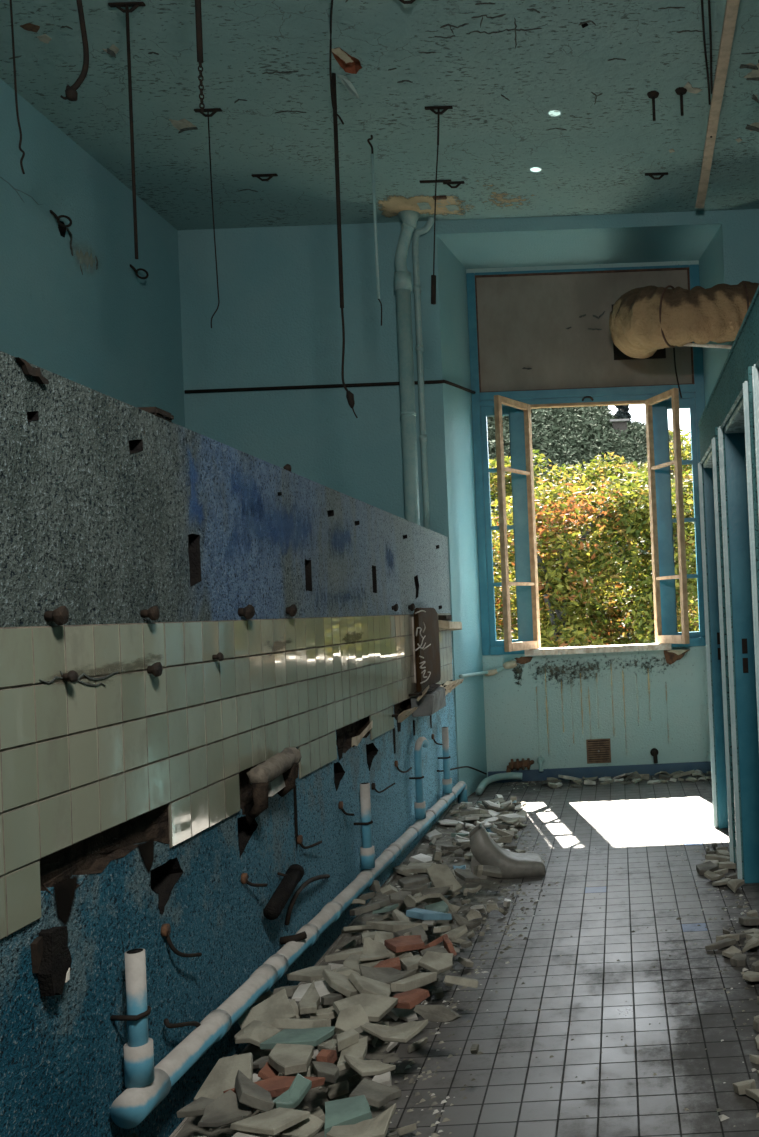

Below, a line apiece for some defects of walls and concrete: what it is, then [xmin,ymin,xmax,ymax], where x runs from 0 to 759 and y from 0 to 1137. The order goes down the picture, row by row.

peeling [378,195,465,218]
leakage [529,654,669,685]
spalling [394,698,411,732]
spalling [334,716,378,791]
spalling [237,761,265,857]
spalling [38,804,183,925]